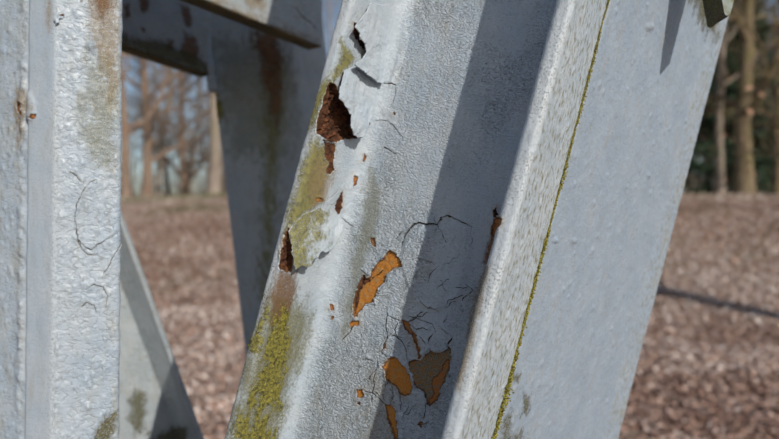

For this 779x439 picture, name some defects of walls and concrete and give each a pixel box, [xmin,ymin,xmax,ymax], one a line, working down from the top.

rust [92,0,209,77]
peeling [306,3,400,174]
crack [71,172,121,313]
peeling [79,413,117,439]
peeling [278,186,354,273]
peeling [342,238,408,340]
peeling [357,318,453,439]
crack [368,258,474,402]
crack [396,215,473,260]